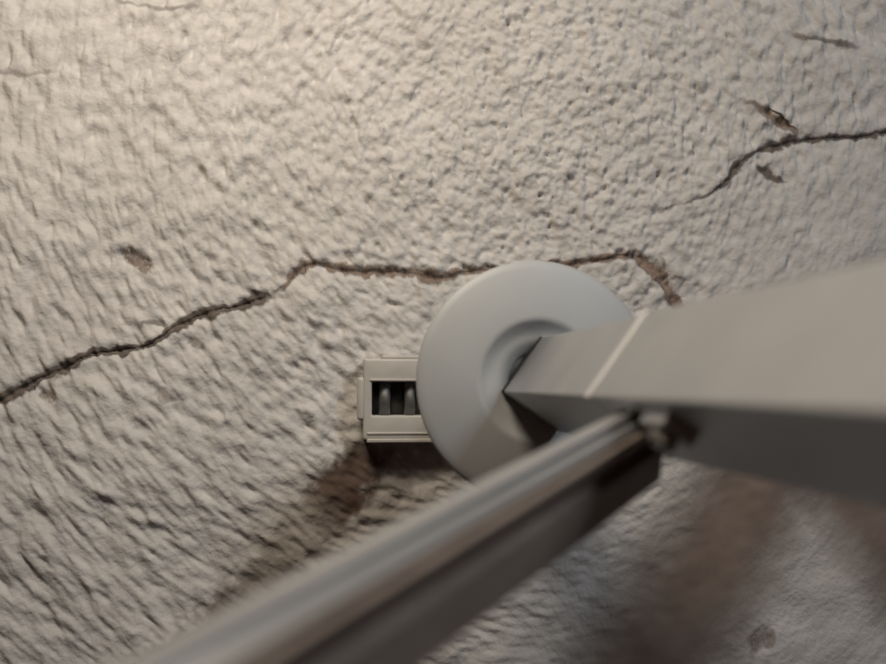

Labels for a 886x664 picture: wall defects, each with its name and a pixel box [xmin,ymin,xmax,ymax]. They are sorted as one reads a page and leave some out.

crack [691,100,886,202]
crack [547,250,682,307]
crack [0,259,495,404]